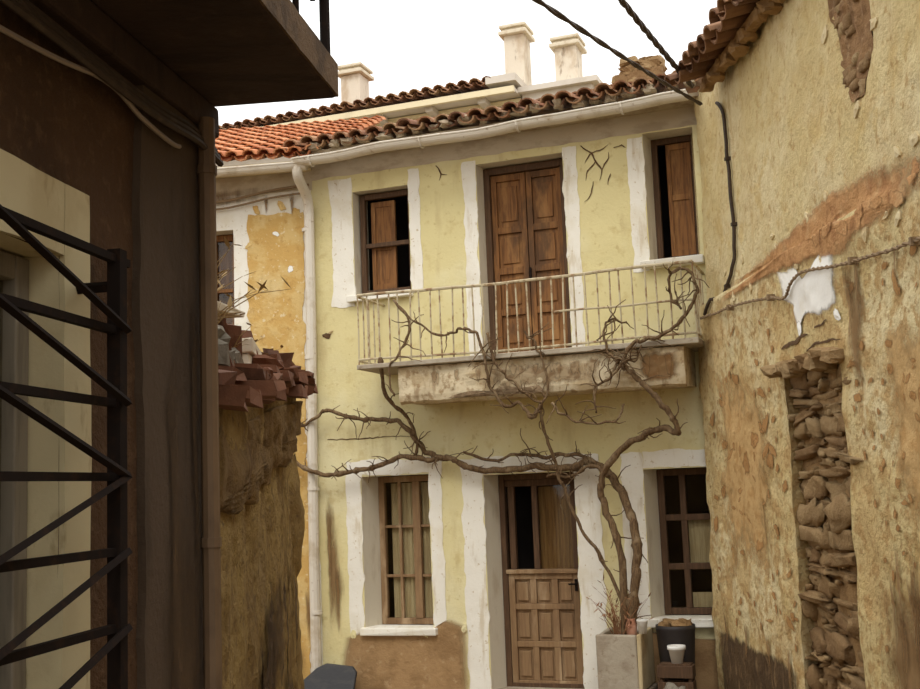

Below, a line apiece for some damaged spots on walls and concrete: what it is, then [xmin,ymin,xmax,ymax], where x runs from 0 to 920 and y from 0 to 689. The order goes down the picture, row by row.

spalling [821,0,878,119]
crack [581,144,626,201]
water stain [261,580,310,689]